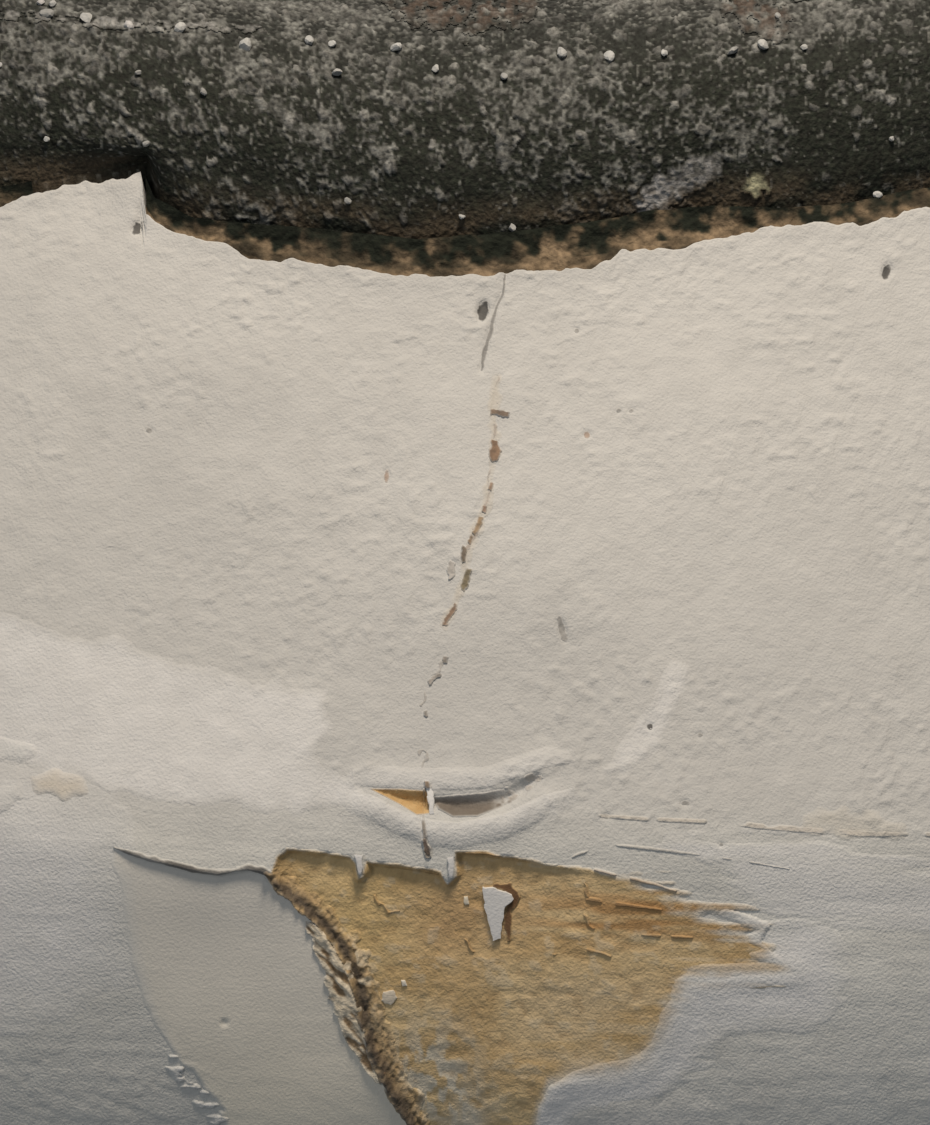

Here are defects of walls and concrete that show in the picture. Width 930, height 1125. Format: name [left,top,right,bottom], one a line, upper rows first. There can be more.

spalling [132,220,144,235]
spalling [881,264,892,280]
crack [419,273,510,718]
crack [417,749,431,859]
spalling [111,846,854,1125]